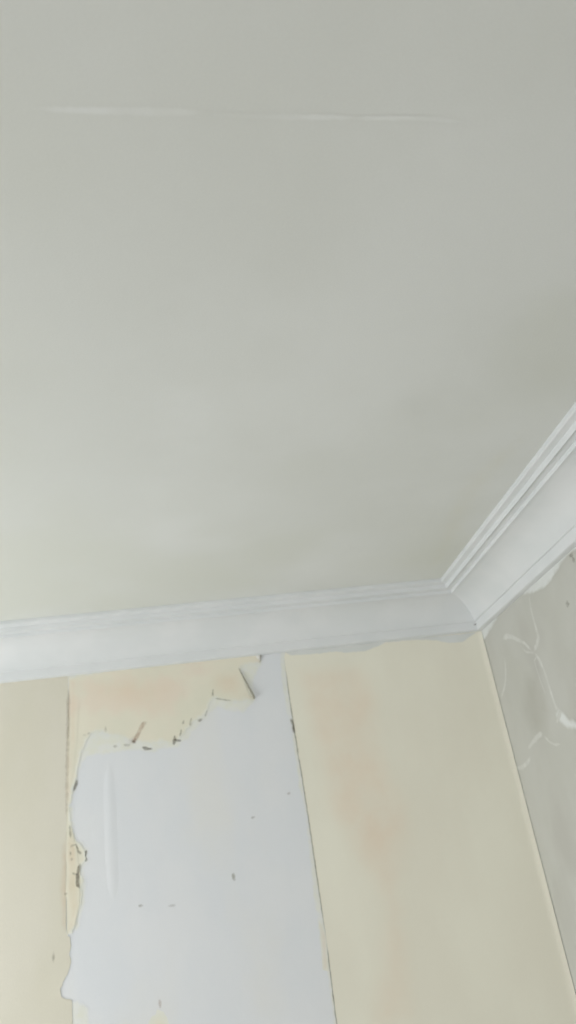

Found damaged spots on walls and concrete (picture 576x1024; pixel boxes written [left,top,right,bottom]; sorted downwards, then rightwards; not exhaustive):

peeling [60,653,333,1024]